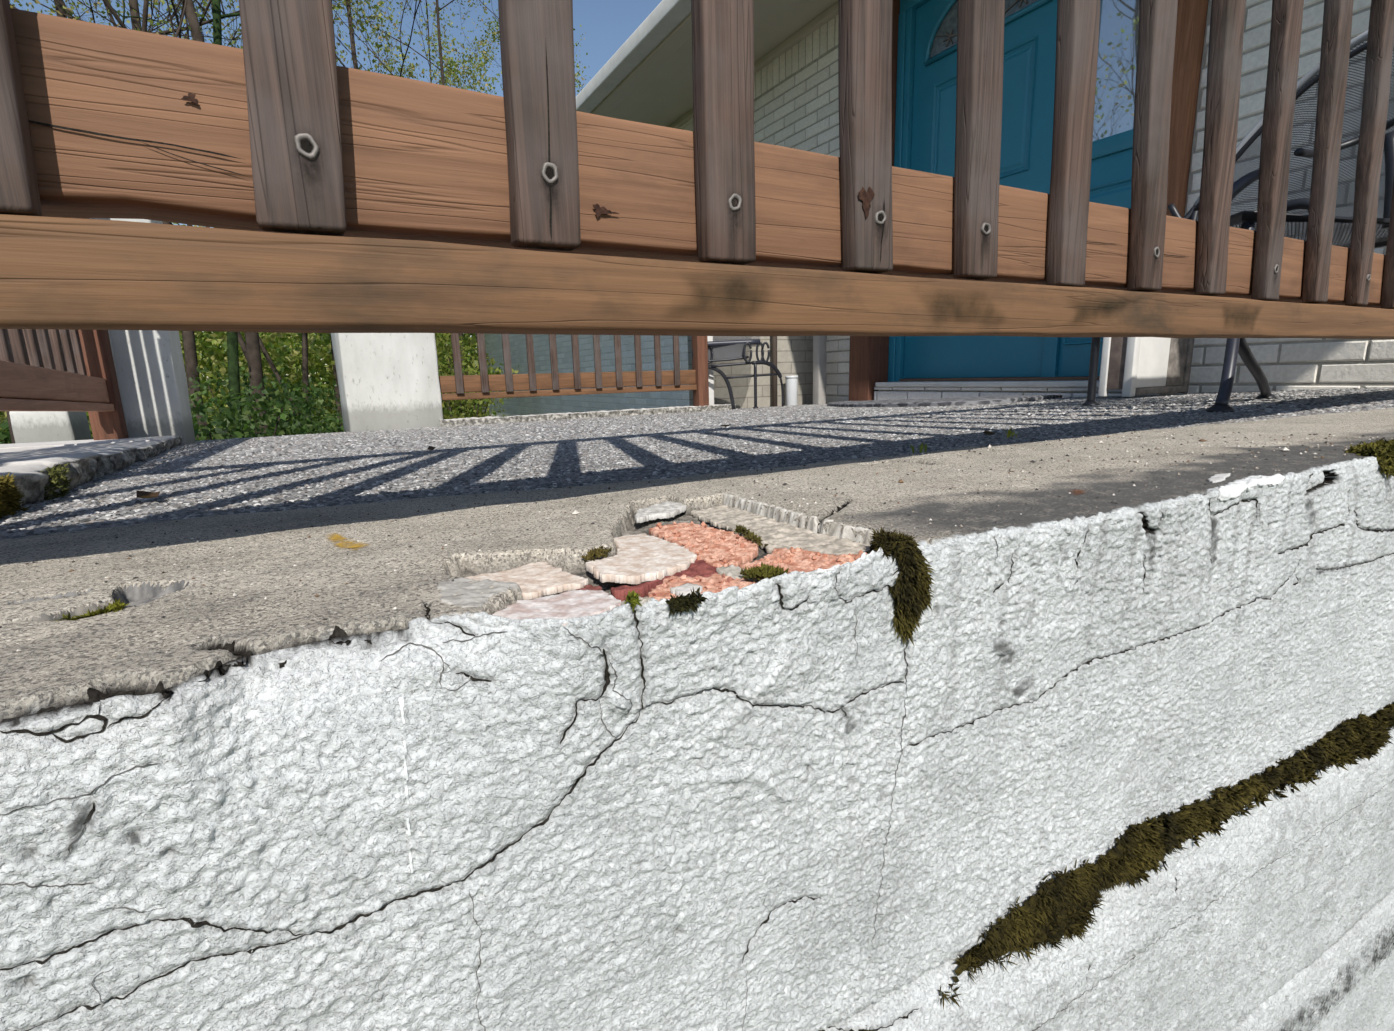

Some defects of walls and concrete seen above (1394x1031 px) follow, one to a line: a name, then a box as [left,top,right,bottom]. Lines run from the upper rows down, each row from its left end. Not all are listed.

spalling [7,580,189,621]
spalling [437,493,881,626]
crack [0,473,1394,1031]